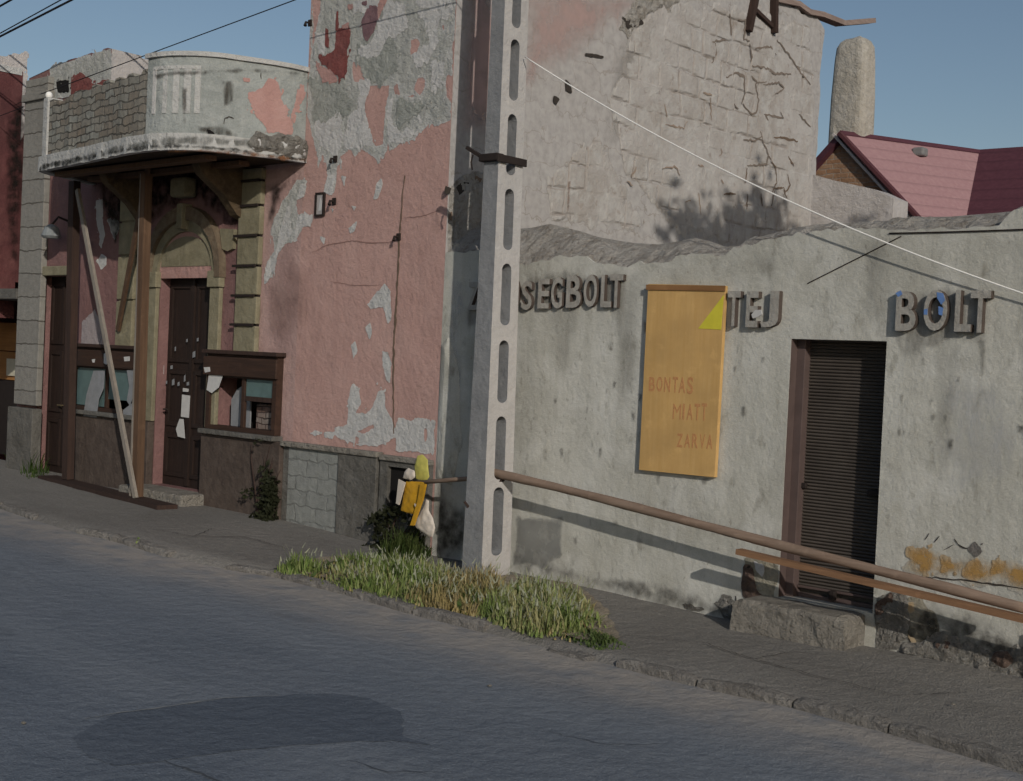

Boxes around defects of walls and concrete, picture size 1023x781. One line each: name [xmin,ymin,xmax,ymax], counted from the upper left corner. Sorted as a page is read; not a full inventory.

flaking render [49,49,113,99]
peeling [243,0,456,195]
peeling [470,0,491,118]
flaking render [547,0,815,246]
peeling [264,178,313,284]
flaking render [444,171,484,251]
peeling [367,284,392,323]
peeling [310,351,436,455]
flaking render [874,592,1023,678]